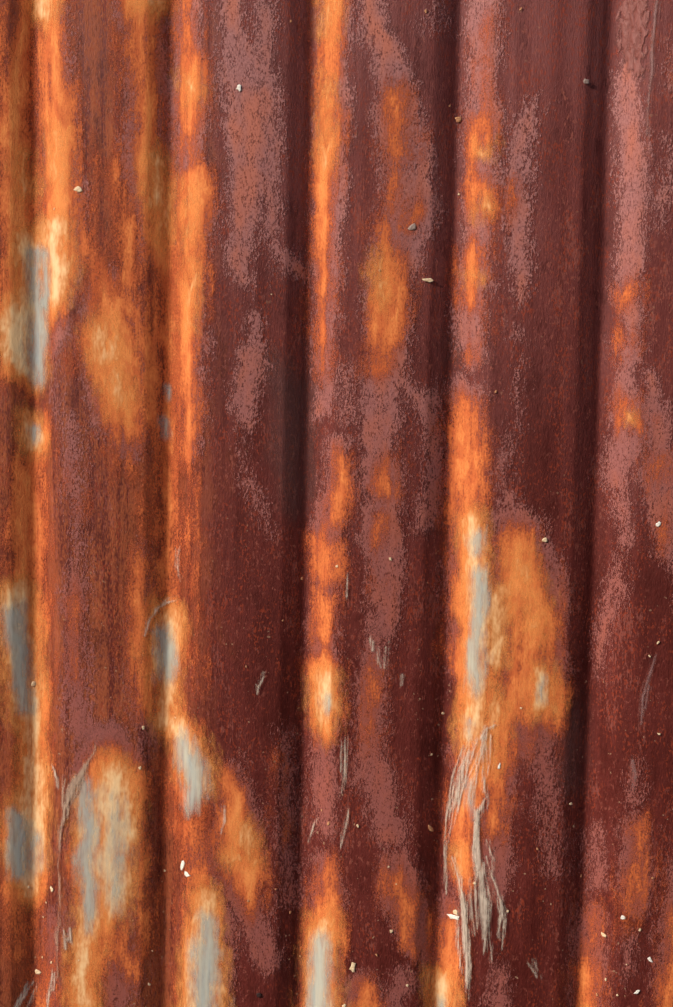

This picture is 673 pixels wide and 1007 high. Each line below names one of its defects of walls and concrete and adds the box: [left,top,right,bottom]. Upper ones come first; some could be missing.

rust [223,307,282,550]
rust [582,57,673,681]
rust [478,949,517,1007]
rust [561,896,617,1007]